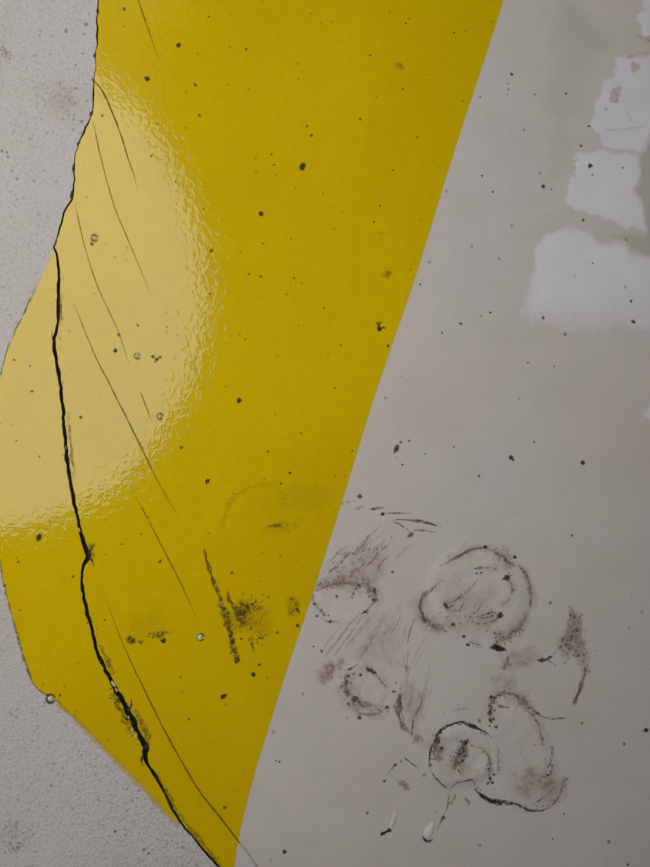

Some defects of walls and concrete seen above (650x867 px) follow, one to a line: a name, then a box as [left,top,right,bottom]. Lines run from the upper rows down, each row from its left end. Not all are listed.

crack [52,0,220,867]
peeling [511,0,650,338]